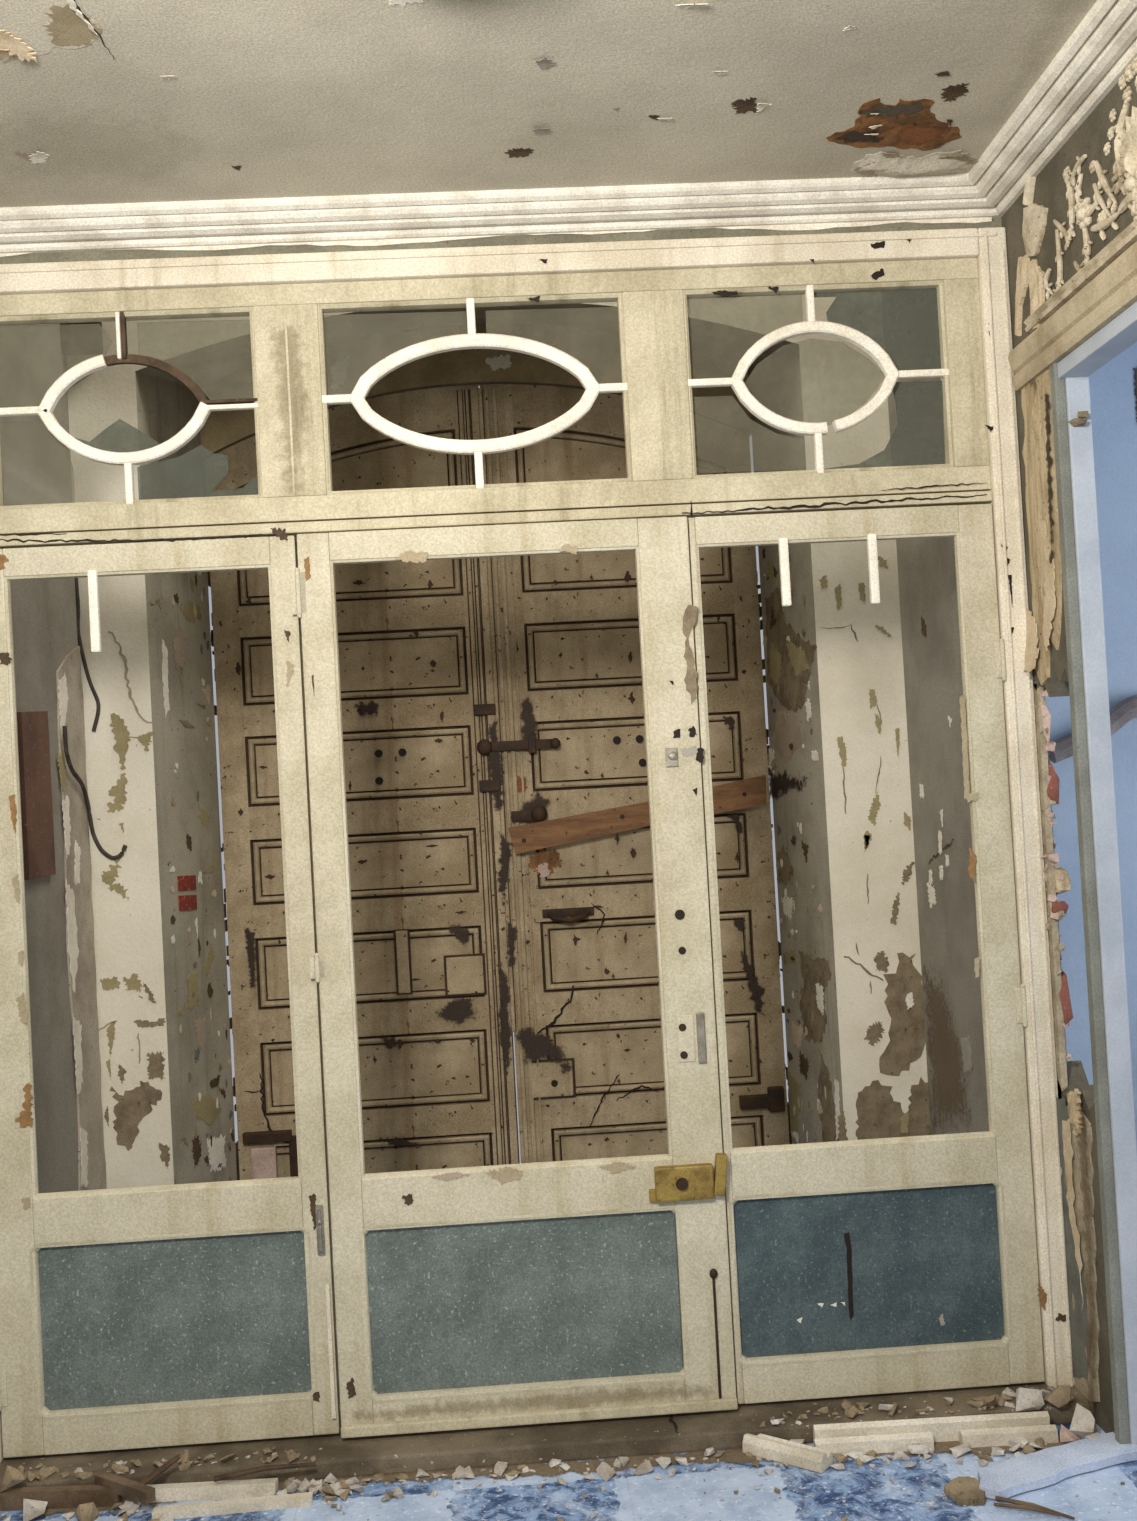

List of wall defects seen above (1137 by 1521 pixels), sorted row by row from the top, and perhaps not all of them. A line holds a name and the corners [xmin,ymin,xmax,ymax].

peeling [0,0,102,62]
crack [74,0,114,59]
rust [826,98,961,151]
peeling [150,572,212,741]
peeling [762,548,866,796]
peeling [869,689,900,755]
peeling [56,646,234,1191]
flaking render [776,822,931,1144]
peeling [863,792,881,851]
flaking render [1001,369,1100,1411]